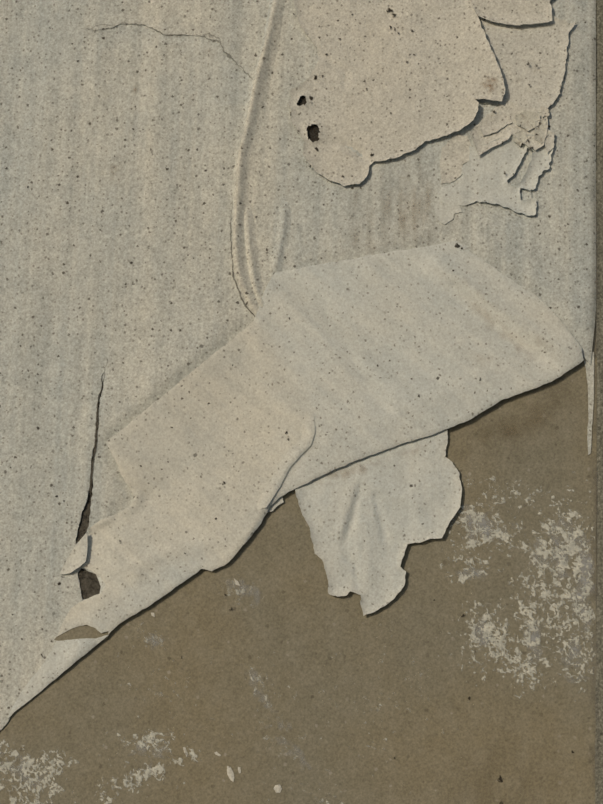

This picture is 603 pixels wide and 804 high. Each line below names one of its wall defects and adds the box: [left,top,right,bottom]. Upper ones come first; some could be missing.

peeling [287,0,576,225]
crack [76,359,108,544]
peeling [0,241,597,804]